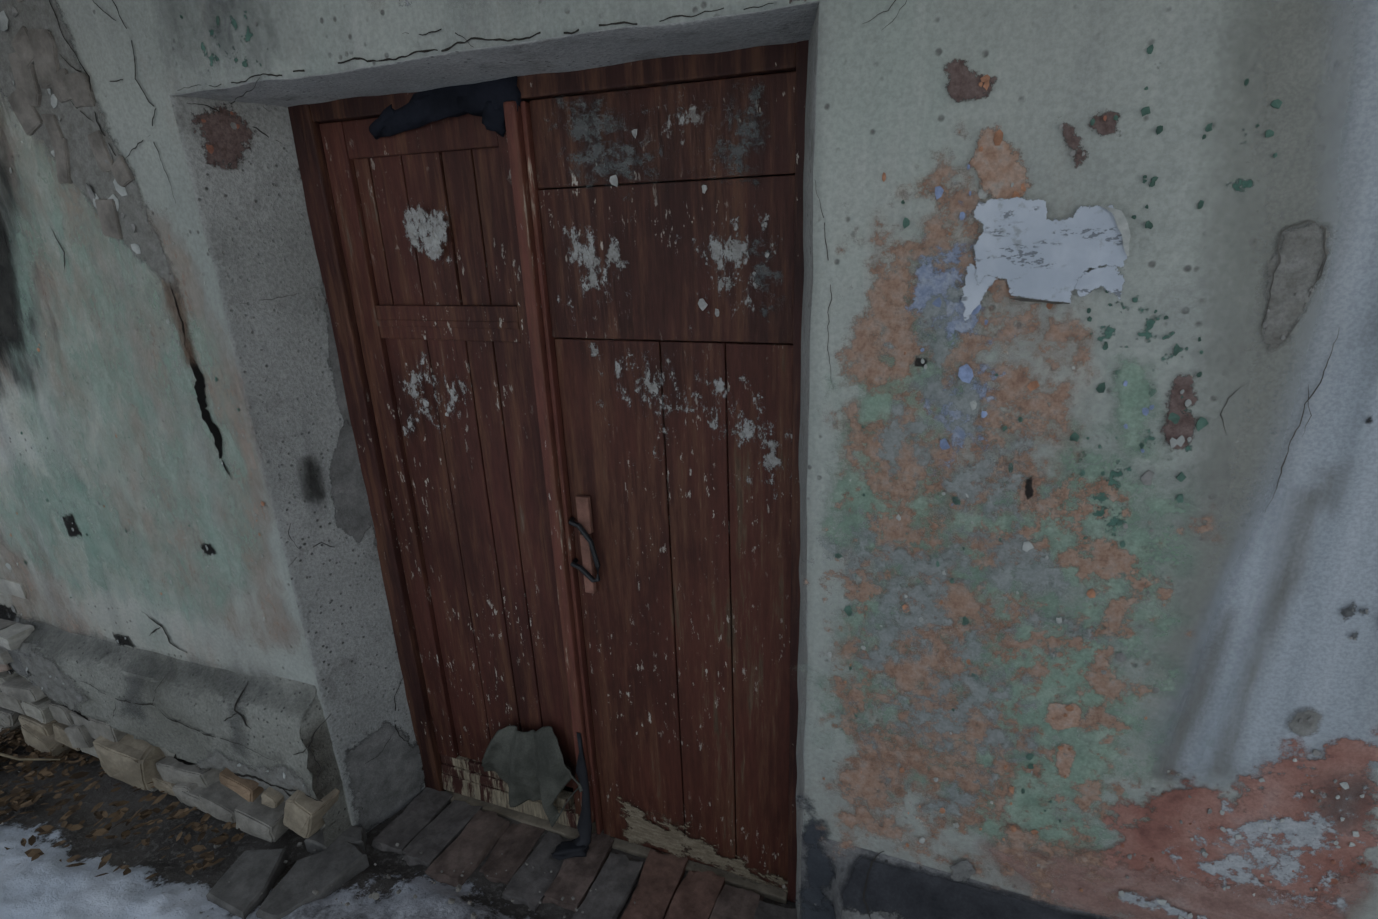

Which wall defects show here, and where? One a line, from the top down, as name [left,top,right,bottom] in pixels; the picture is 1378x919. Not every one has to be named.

spalling [0,0,181,298]
peeling [1141,87,1163,135]
damp [0,226,23,347]
crack [170,285,232,479]
crack [1265,331,1339,511]
spalling [61,514,82,537]
spalling [201,543,216,556]
peeling [616,125,1378,919]
spalling [112,633,134,648]